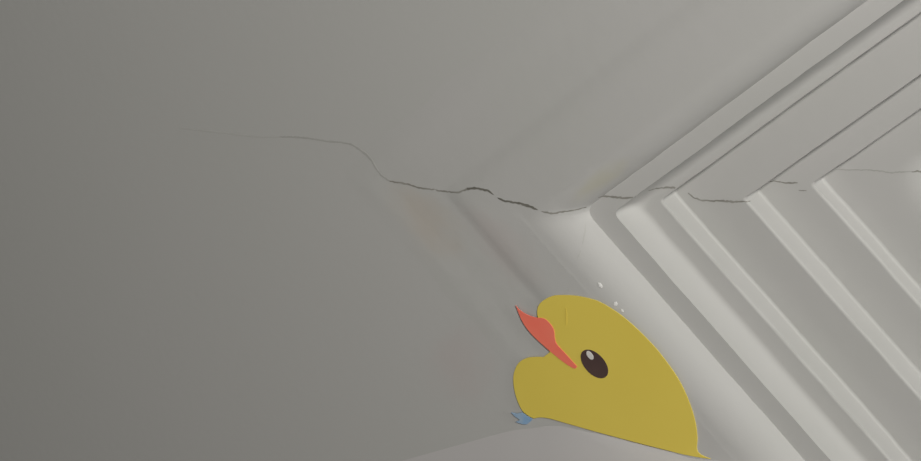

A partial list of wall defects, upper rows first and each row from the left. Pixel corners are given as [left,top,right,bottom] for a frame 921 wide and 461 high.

crack [181,128,750,214]
crack [769,180,807,191]